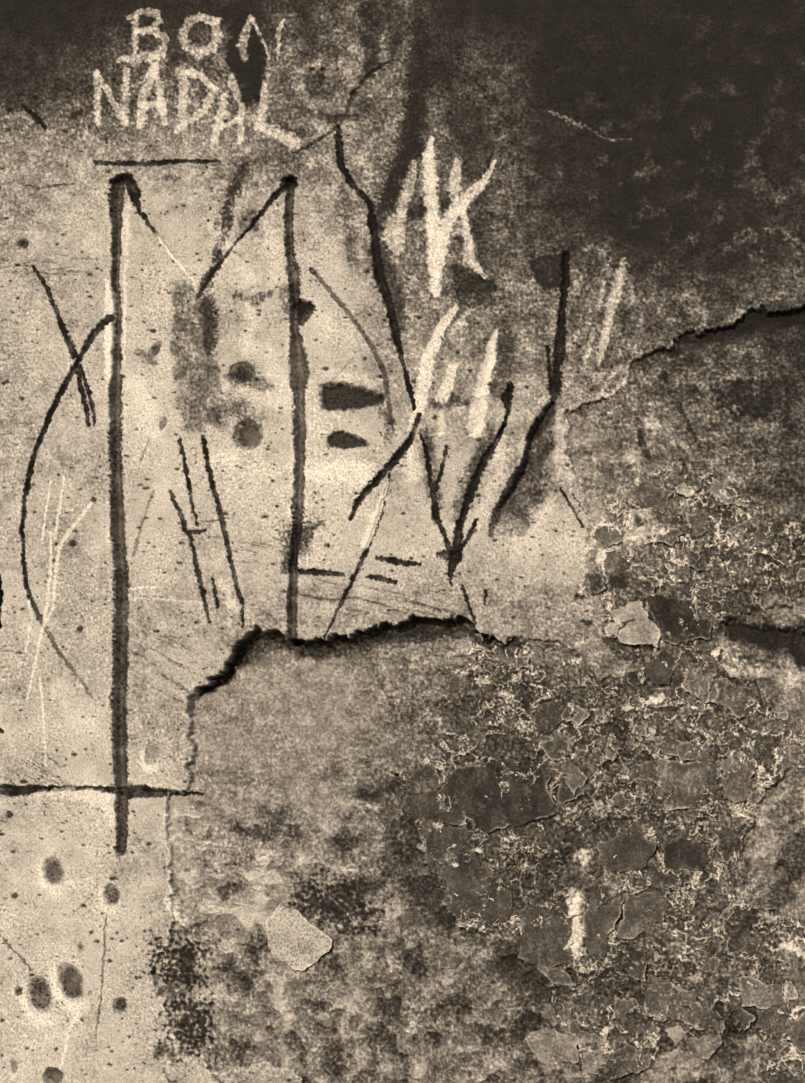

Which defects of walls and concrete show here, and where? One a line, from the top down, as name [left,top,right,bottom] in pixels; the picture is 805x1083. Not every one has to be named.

peeling [166,303,805,1083]
crack [662,368,702,448]